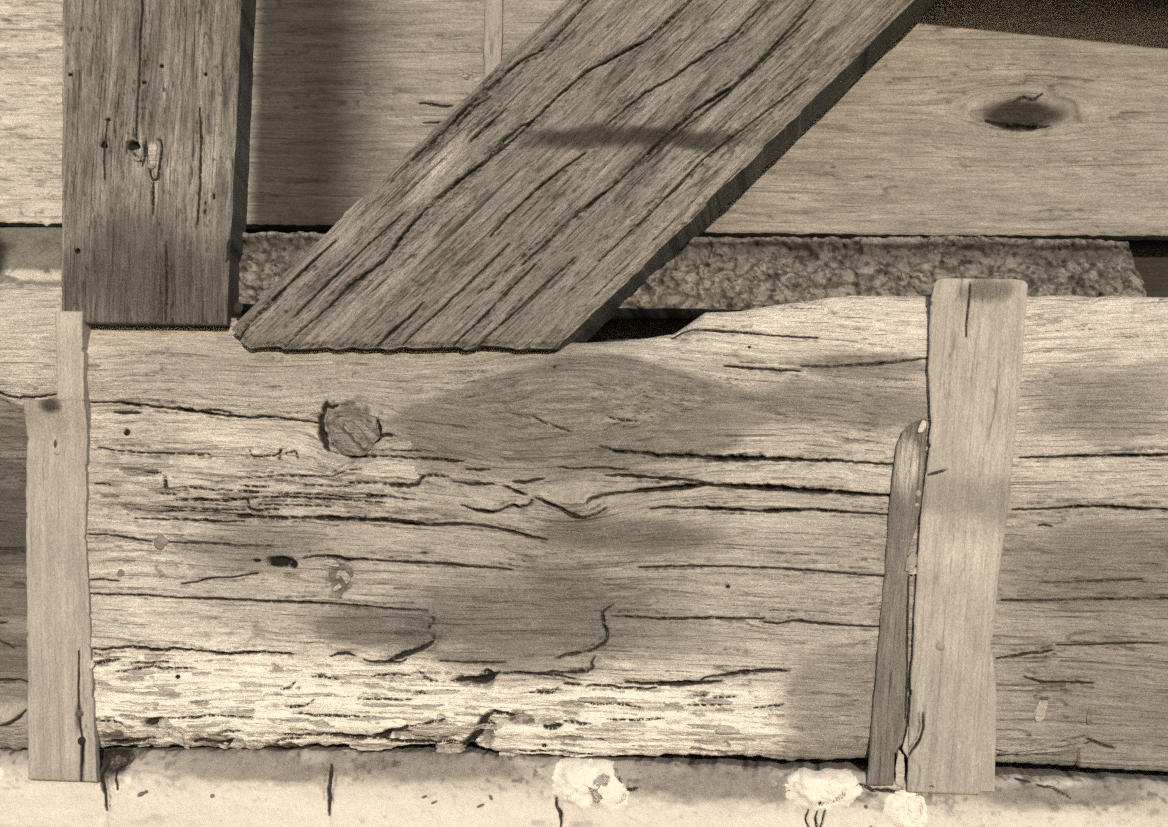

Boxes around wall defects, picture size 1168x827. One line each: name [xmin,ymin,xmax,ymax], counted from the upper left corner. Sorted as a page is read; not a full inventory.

crack [103,0,144,179]
crack [196,107,204,225]
crack [239,0,816,347]
crack [1020,451,1168,459]
crack [1012,505,1168,527]
crack [77,401,924,815]
crack [1001,578,1168,601]
crack [996,642,1159,684]
crack [0,710,26,726]
crack [1083,738,1113,748]
crack [555,791,577,827]
crack [787,783,921,827]